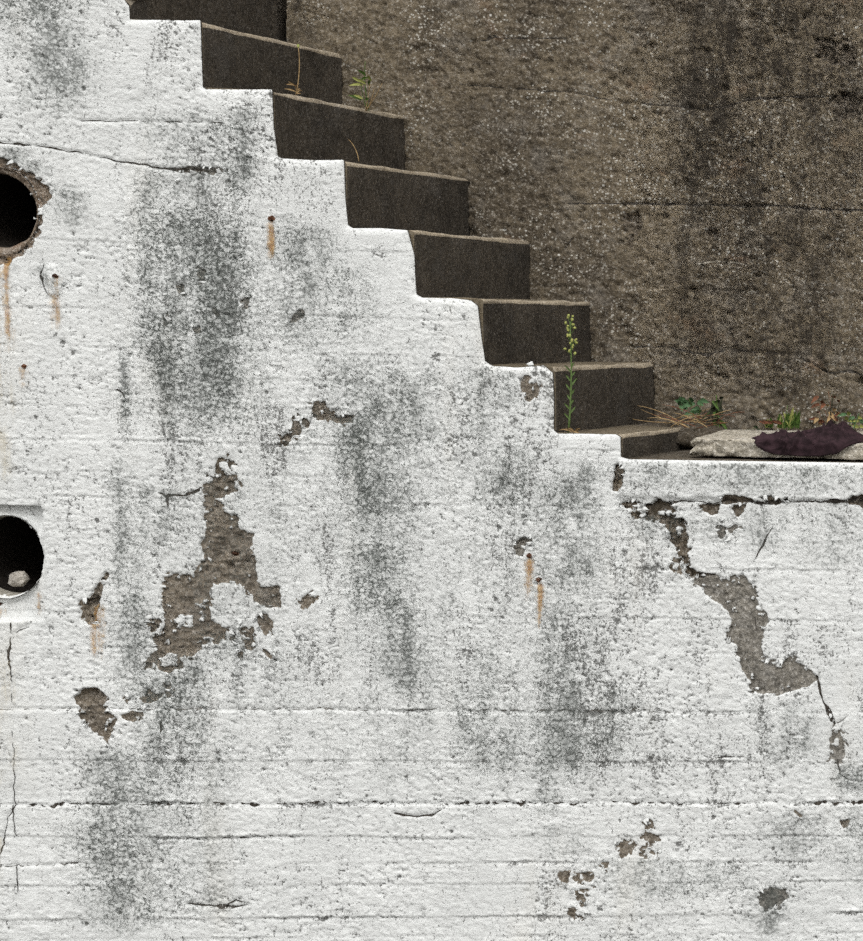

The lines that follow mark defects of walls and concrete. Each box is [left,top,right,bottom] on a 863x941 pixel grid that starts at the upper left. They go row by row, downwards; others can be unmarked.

crack [0,142,222,174]
water stain [46,184,90,225]
rust [0,257,12,335]
peeling [278,400,355,449]
water stain [62,107,375,935]
peeling [74,453,281,744]
rust [526,559,543,622]
peeling [622,495,817,697]
crack [0,621,671,733]
crack [816,675,846,724]
crack [0,744,682,906]
peeling [557,862,609,924]